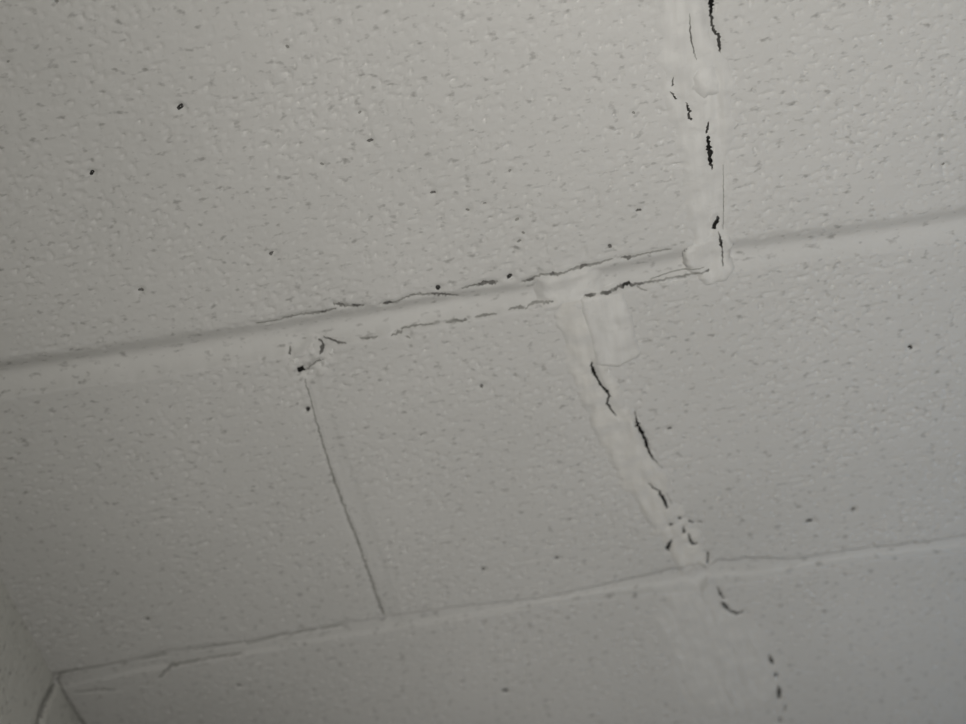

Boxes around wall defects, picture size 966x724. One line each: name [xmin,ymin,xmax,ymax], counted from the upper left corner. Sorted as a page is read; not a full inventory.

crack [689,0,721,60]
crack [257,77,724,340]
crack [589,361,709,563]
crack [717,586,743,615]
crack [769,654,786,722]